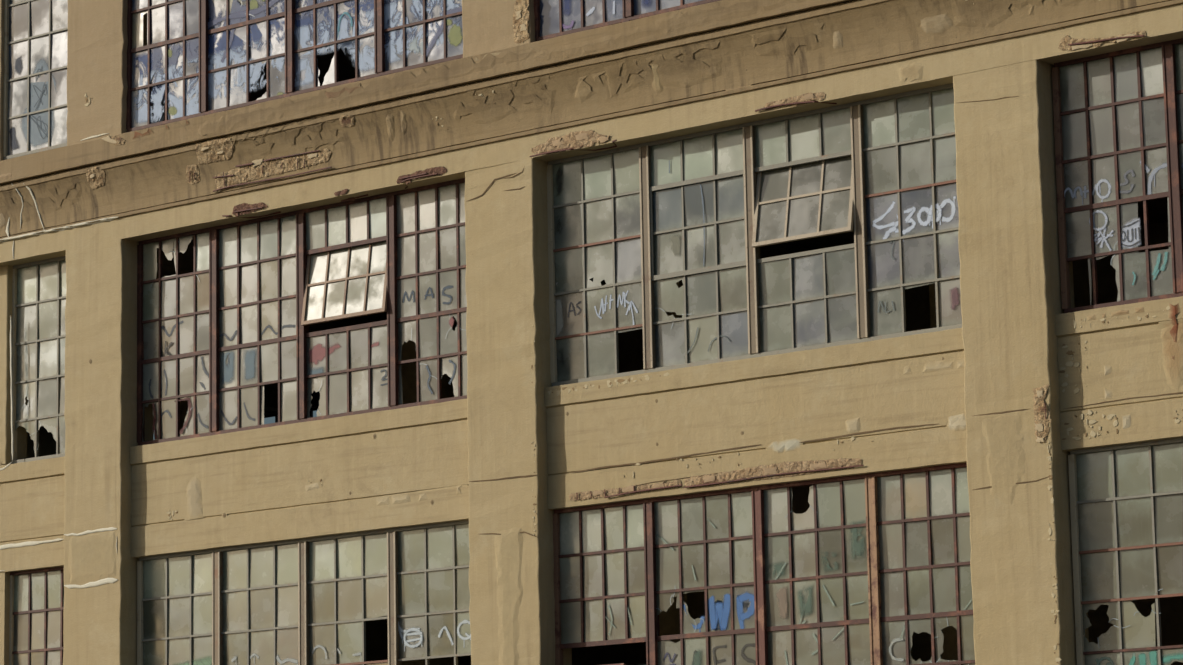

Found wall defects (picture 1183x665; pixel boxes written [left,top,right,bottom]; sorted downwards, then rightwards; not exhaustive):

water stain [951,0,1084,28]
water stain [198,0,806,156]
crack [0,183,118,259]
spalling [222,202,281,218]
spalling [186,138,332,192]
crack [468,166,525,201]
spalling [529,130,617,157]
corrosion [1159,303,1183,391]
crack [0,316,13,470]
crack [0,527,117,589]